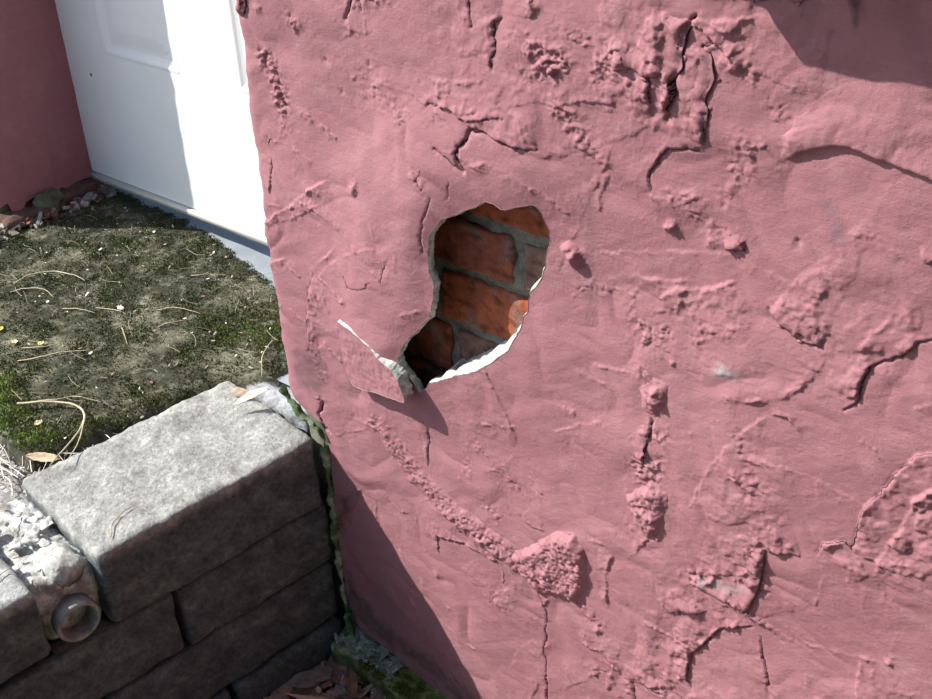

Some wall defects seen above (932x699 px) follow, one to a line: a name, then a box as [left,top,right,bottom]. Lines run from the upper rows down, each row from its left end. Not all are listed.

crack [468,0,502,68]
crack [647,77,677,116]
crack [415,103,534,253]
crack [649,125,705,185]
spalling [337,202,550,403]
crack [857,341,926,402]
crack [540,598,548,697]